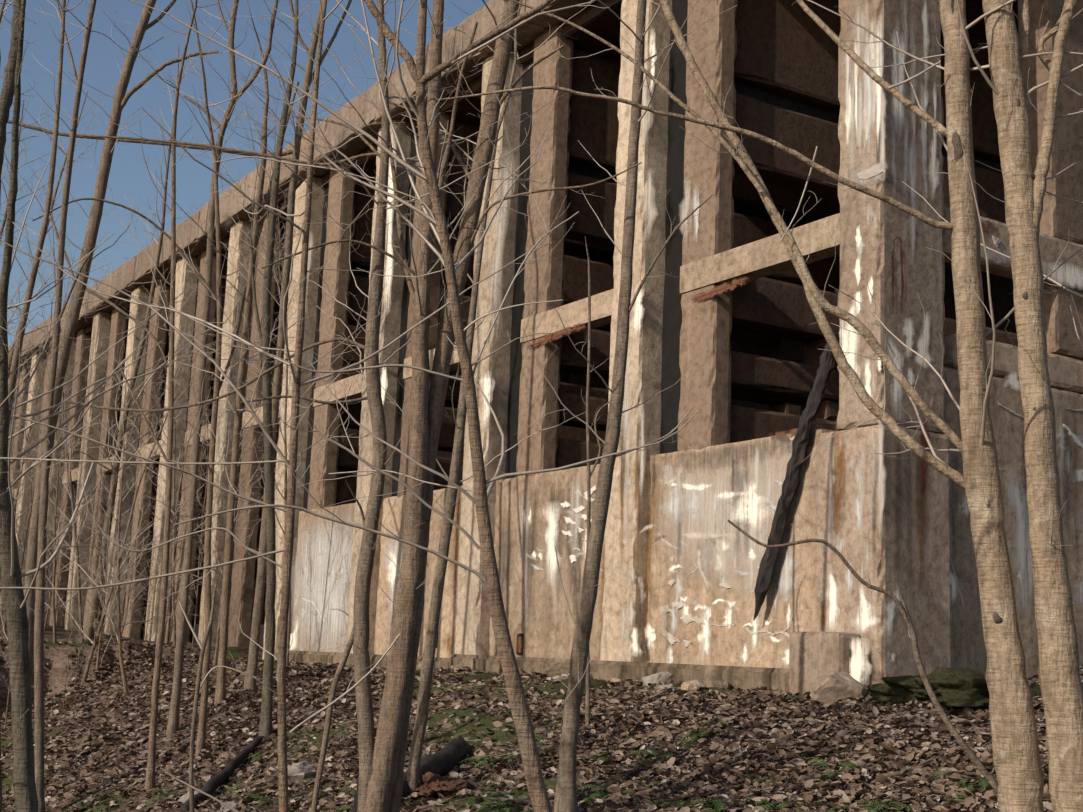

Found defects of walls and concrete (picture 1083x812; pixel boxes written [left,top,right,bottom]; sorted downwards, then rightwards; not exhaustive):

water stain [845,2,939,248]
rust [892,237,904,312]
peeling [561,485,596,537]
water stain [827,424,885,552]
peeling [663,630,691,648]
water stain [821,550,900,683]